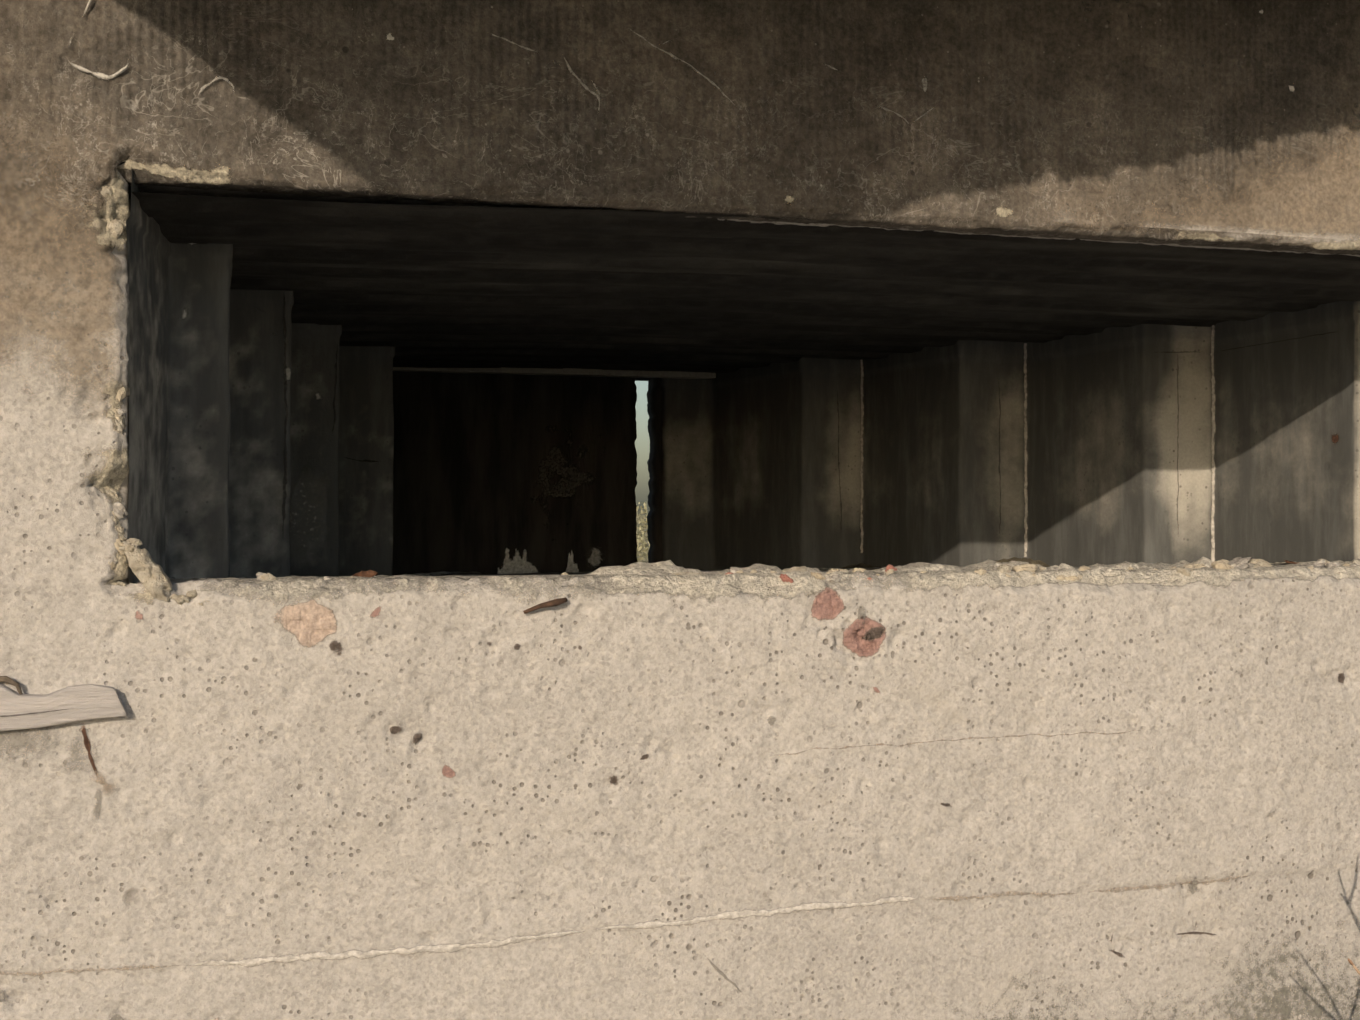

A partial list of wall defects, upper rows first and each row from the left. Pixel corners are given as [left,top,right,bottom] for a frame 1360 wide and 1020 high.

spalling [86,160,232,251]
spalling [86,380,154,619]
crack [1177,923,1214,936]
crack [708,959,741,992]